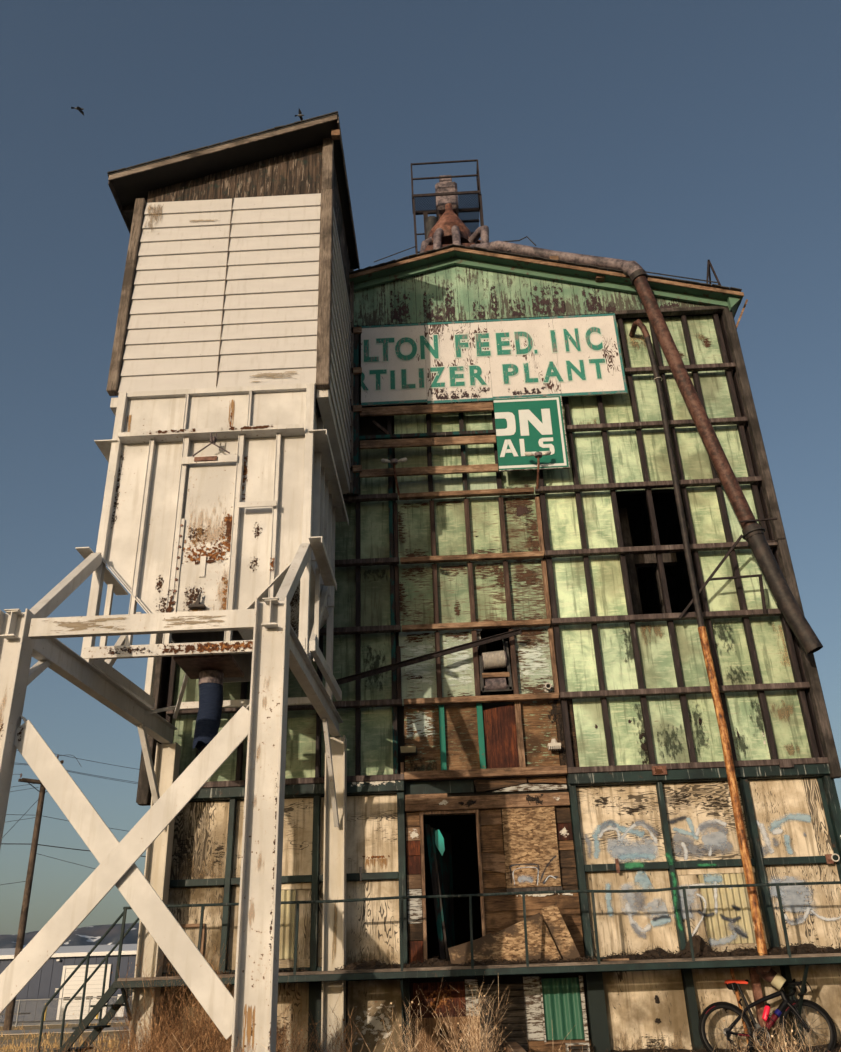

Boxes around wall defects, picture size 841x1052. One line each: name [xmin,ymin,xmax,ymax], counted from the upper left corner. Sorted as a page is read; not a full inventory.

peeling [423,284,455,321]
peeling [473,284,565,318]
peeling [582,287,616,312]
rust [222,400,273,430]
rust [183,513,233,565]
rust [155,575,204,613]
rust [104,641,253,655]
peeling [406,712,435,737]
peeling [355,1004,394,1045]